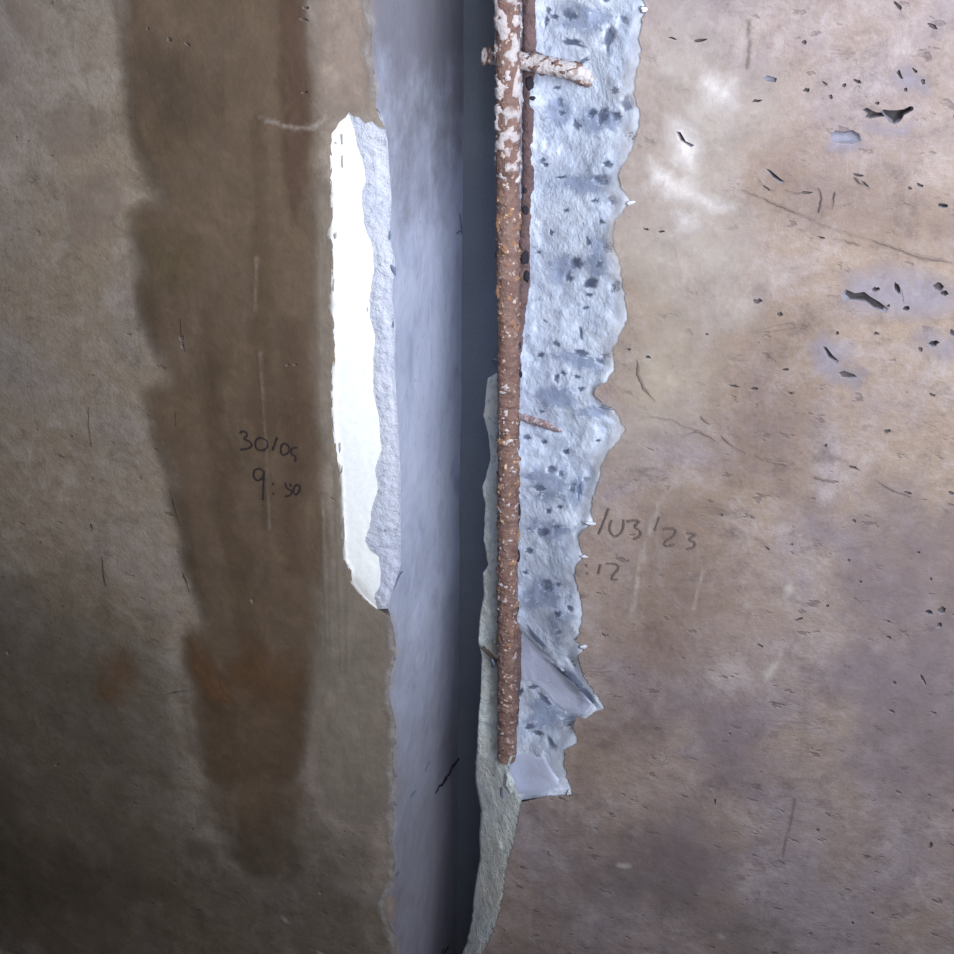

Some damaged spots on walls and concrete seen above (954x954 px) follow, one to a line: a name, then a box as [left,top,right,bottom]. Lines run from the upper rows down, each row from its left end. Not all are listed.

water stain [128,0,388,868]
peeling [329,111,401,954]
rust [520,250,530,283]
rust [525,76,536,101]
spalling [462,0,648,954]
crack [742,180,954,263]